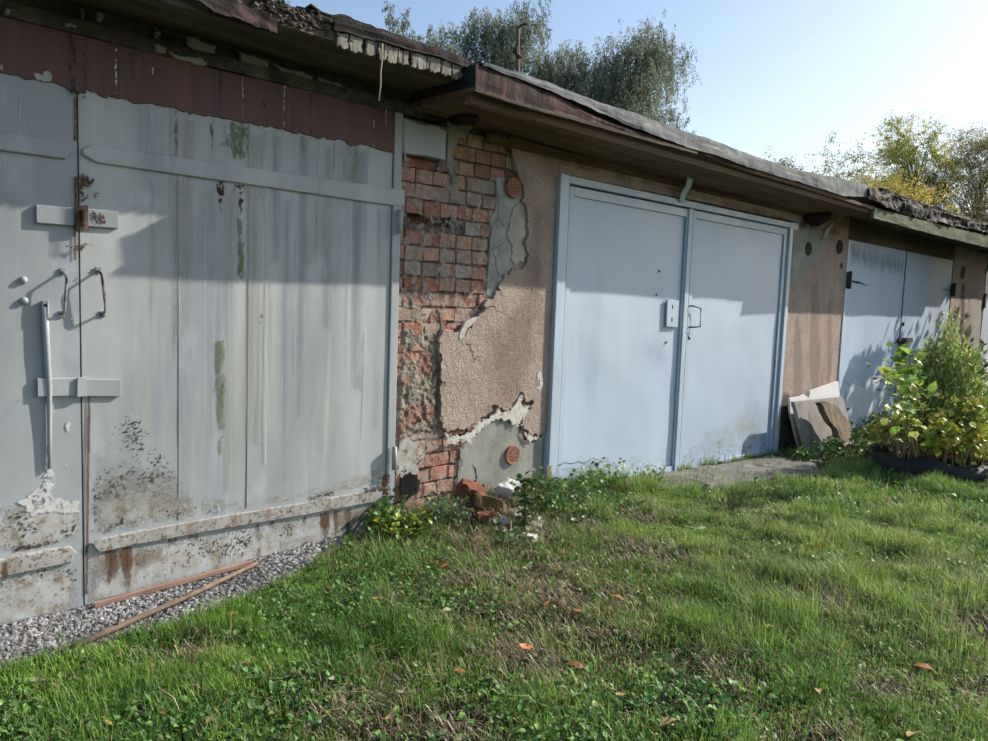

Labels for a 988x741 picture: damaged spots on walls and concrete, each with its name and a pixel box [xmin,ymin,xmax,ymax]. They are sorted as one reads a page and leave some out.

spalling [153,28,216,67]
peeling [237,0,463,80]
rust [74,173,106,224]
peeling [483,177,527,298]
peeling [459,317,478,340]
crack [432,353,446,421]
leakage [0,437,80,550]
leakage [92,411,241,532]
rust [320,474,391,540]
leakage [0,562,78,624]
rust [105,535,198,584]
leakage [89,505,377,601]